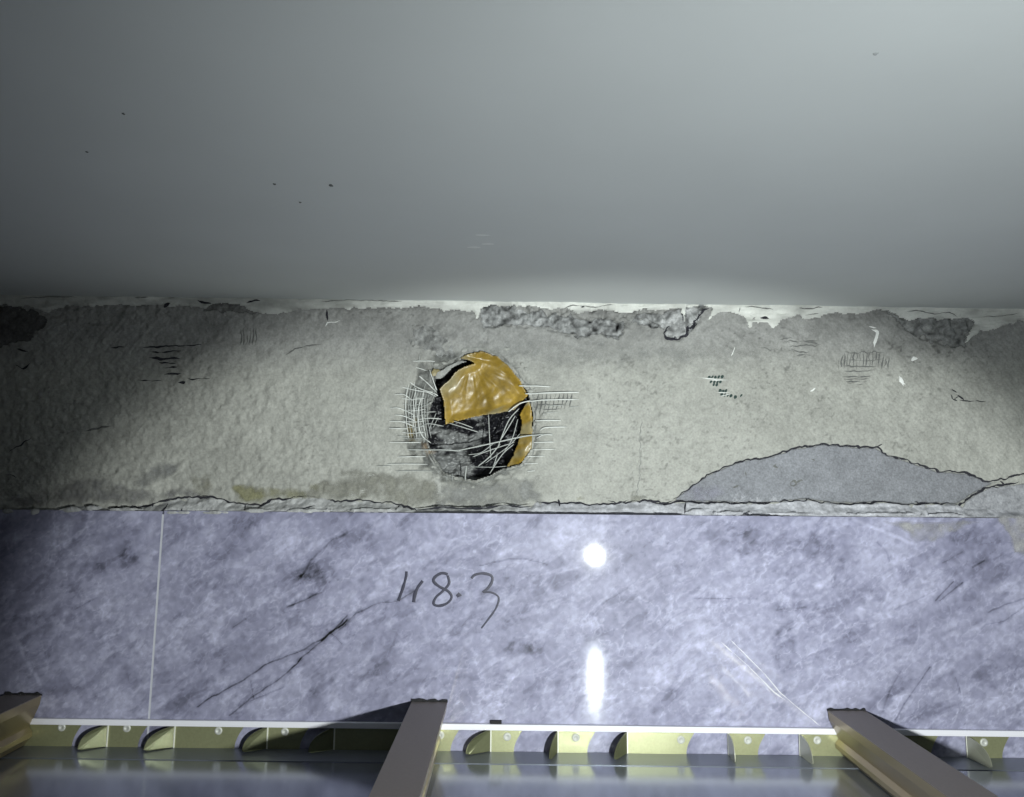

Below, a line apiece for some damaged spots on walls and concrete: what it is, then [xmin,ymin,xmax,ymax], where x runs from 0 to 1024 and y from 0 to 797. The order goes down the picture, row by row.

flaking render [480,304,704,339]
flaking render [886,310,974,348]
spalling [405,324,547,490]
flaking render [676,445,1024,517]
crack [107,495,417,512]